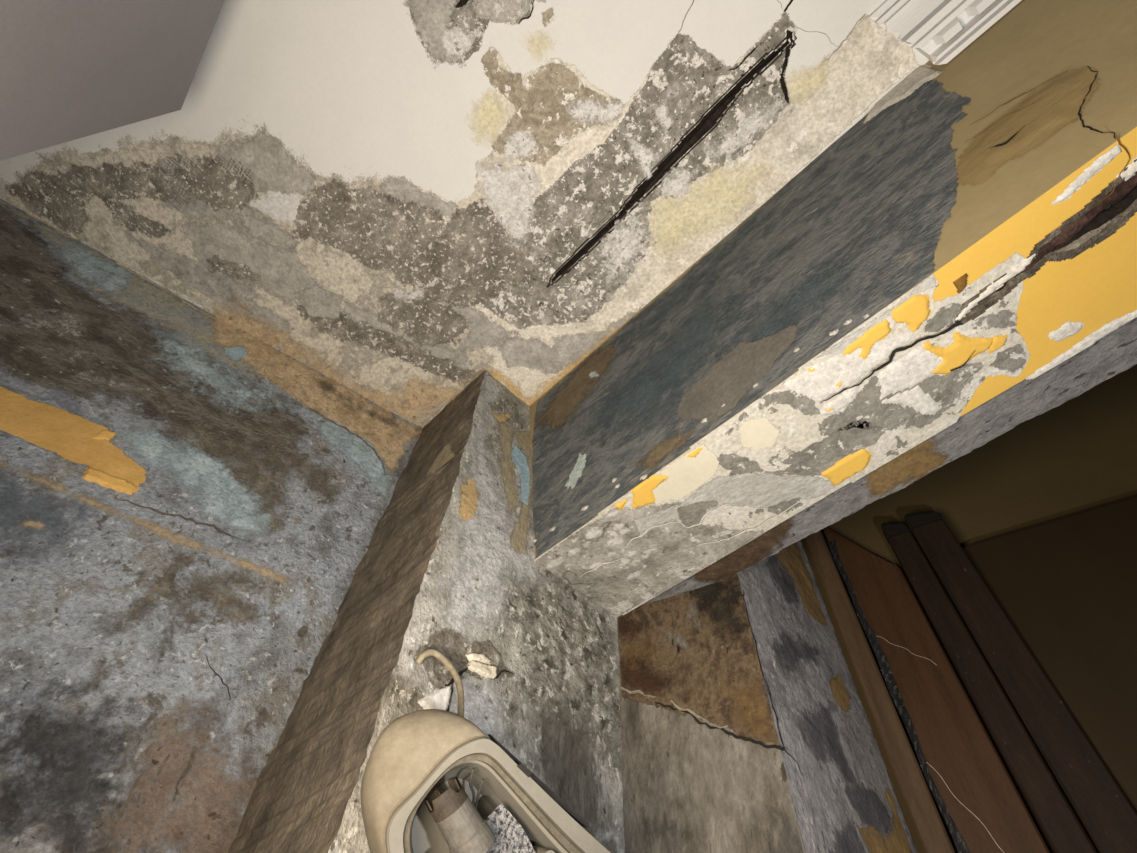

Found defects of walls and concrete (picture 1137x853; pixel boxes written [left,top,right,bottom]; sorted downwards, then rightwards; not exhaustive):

crack [777,0,866,70]
crack [1078,66,1131,211]
water stain [0,209,462,534]
peeling [0,0,1137,626]
water stain [0,477,85,553]
water stain [438,330,617,641]
water stain [109,553,262,649]
water stain [0,660,258,853]
water stain [451,678,501,741]